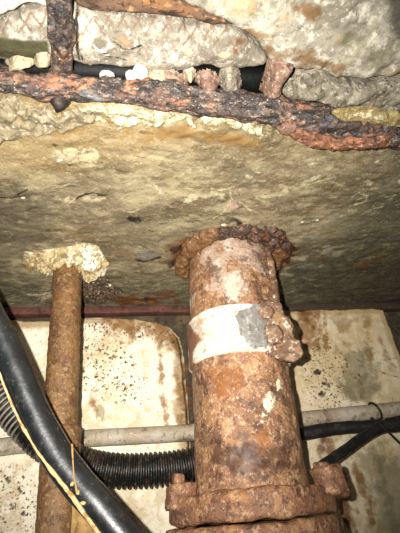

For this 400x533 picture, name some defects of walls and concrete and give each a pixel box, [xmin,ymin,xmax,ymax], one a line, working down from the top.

spalling [0,0,400,151]
leakage [22,243,109,284]
corrosion [168,218,298,279]